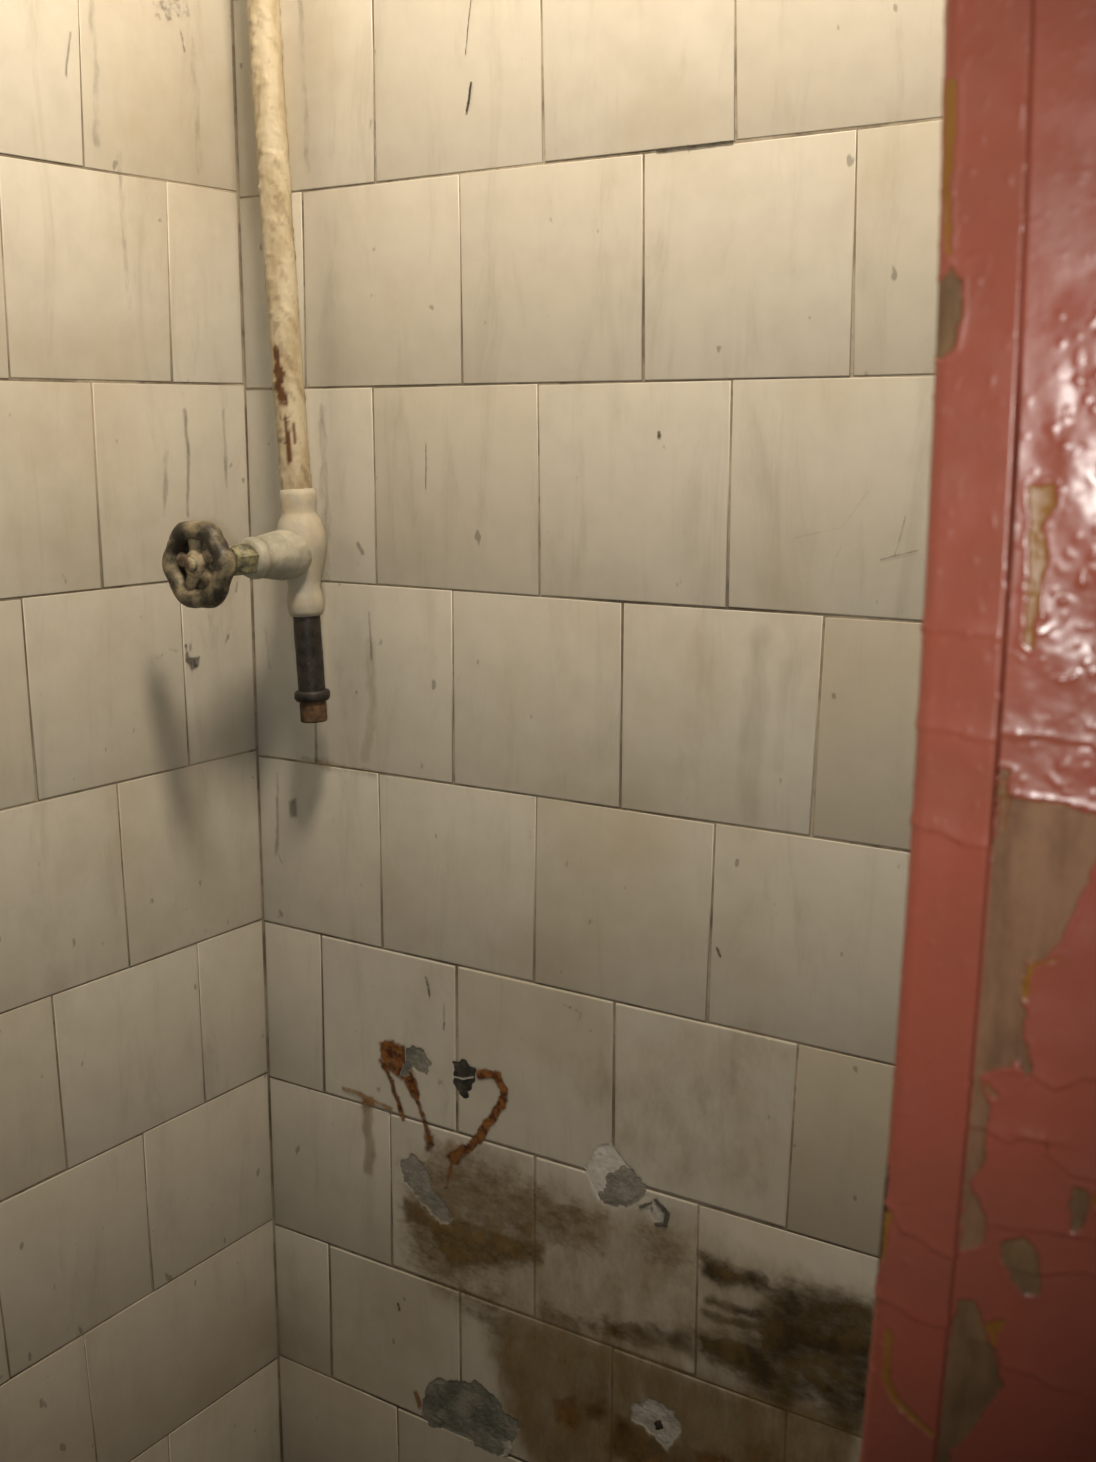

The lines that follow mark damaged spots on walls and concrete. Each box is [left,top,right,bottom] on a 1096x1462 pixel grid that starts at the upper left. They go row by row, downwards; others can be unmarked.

peeling [935,266,963,360]
peeling [958,769,1096,1297]
corrosion [342,1040,508,1189]
spalling [400,1153,451,1223]
spalling [584,1142,670,1227]
spalling [422,1378,521,1456]
spalling [632,1397,681,1450]
damp [699,1254,874,1428]
peeling [936,1299,1004,1462]